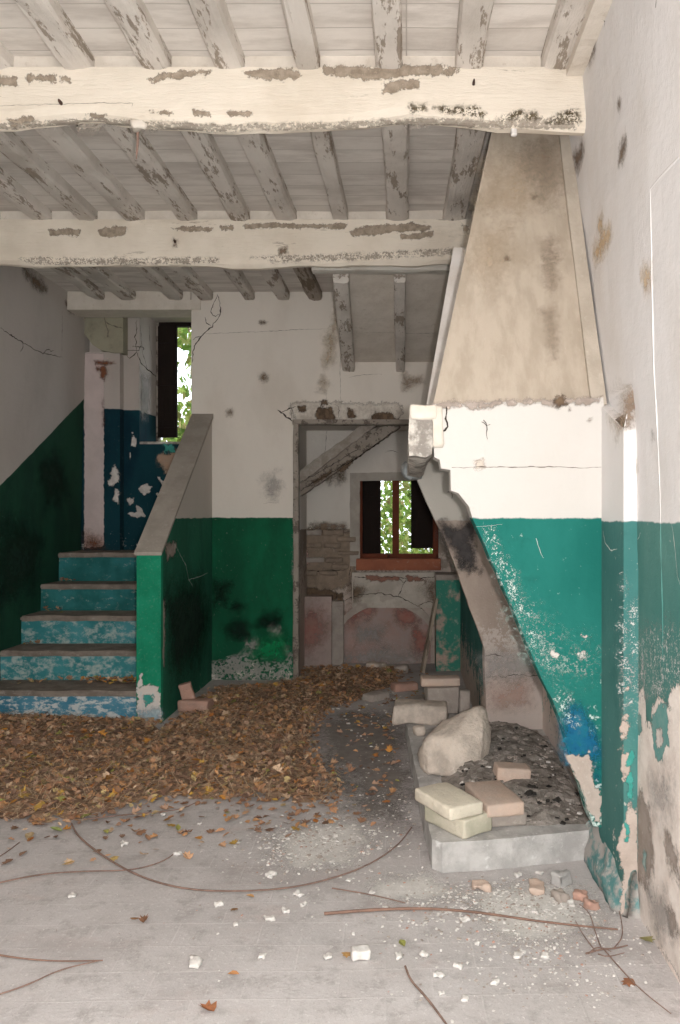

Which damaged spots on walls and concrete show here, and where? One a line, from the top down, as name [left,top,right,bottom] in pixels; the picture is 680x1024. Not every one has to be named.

peeling [245,67,302,81]
peeling [145,109,575,132]
peeling [177,221,451,262]
crack [4,331,56,356]
corrosion [95,360,112,380]
crack [192,295,303,362]
spalling [436,393,600,411]
peeling [107,451,176,518]
leakage [164,577,282,675]
spalling [485,526,596,727]
peeling [565,750,602,823]
peeling [616,572,680,981]